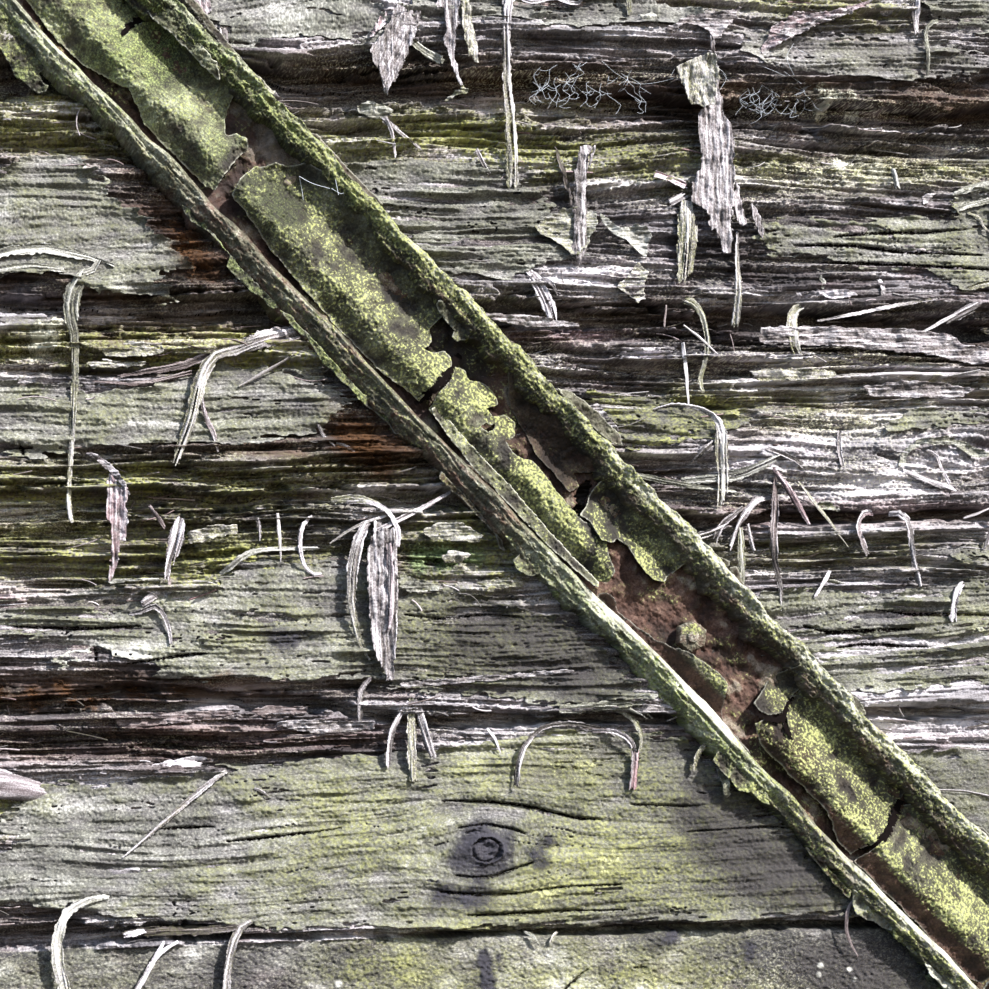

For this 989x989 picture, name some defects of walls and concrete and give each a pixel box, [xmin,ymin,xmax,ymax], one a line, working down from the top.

peeling [0,154,858,989]
peeling [195,0,989,693]